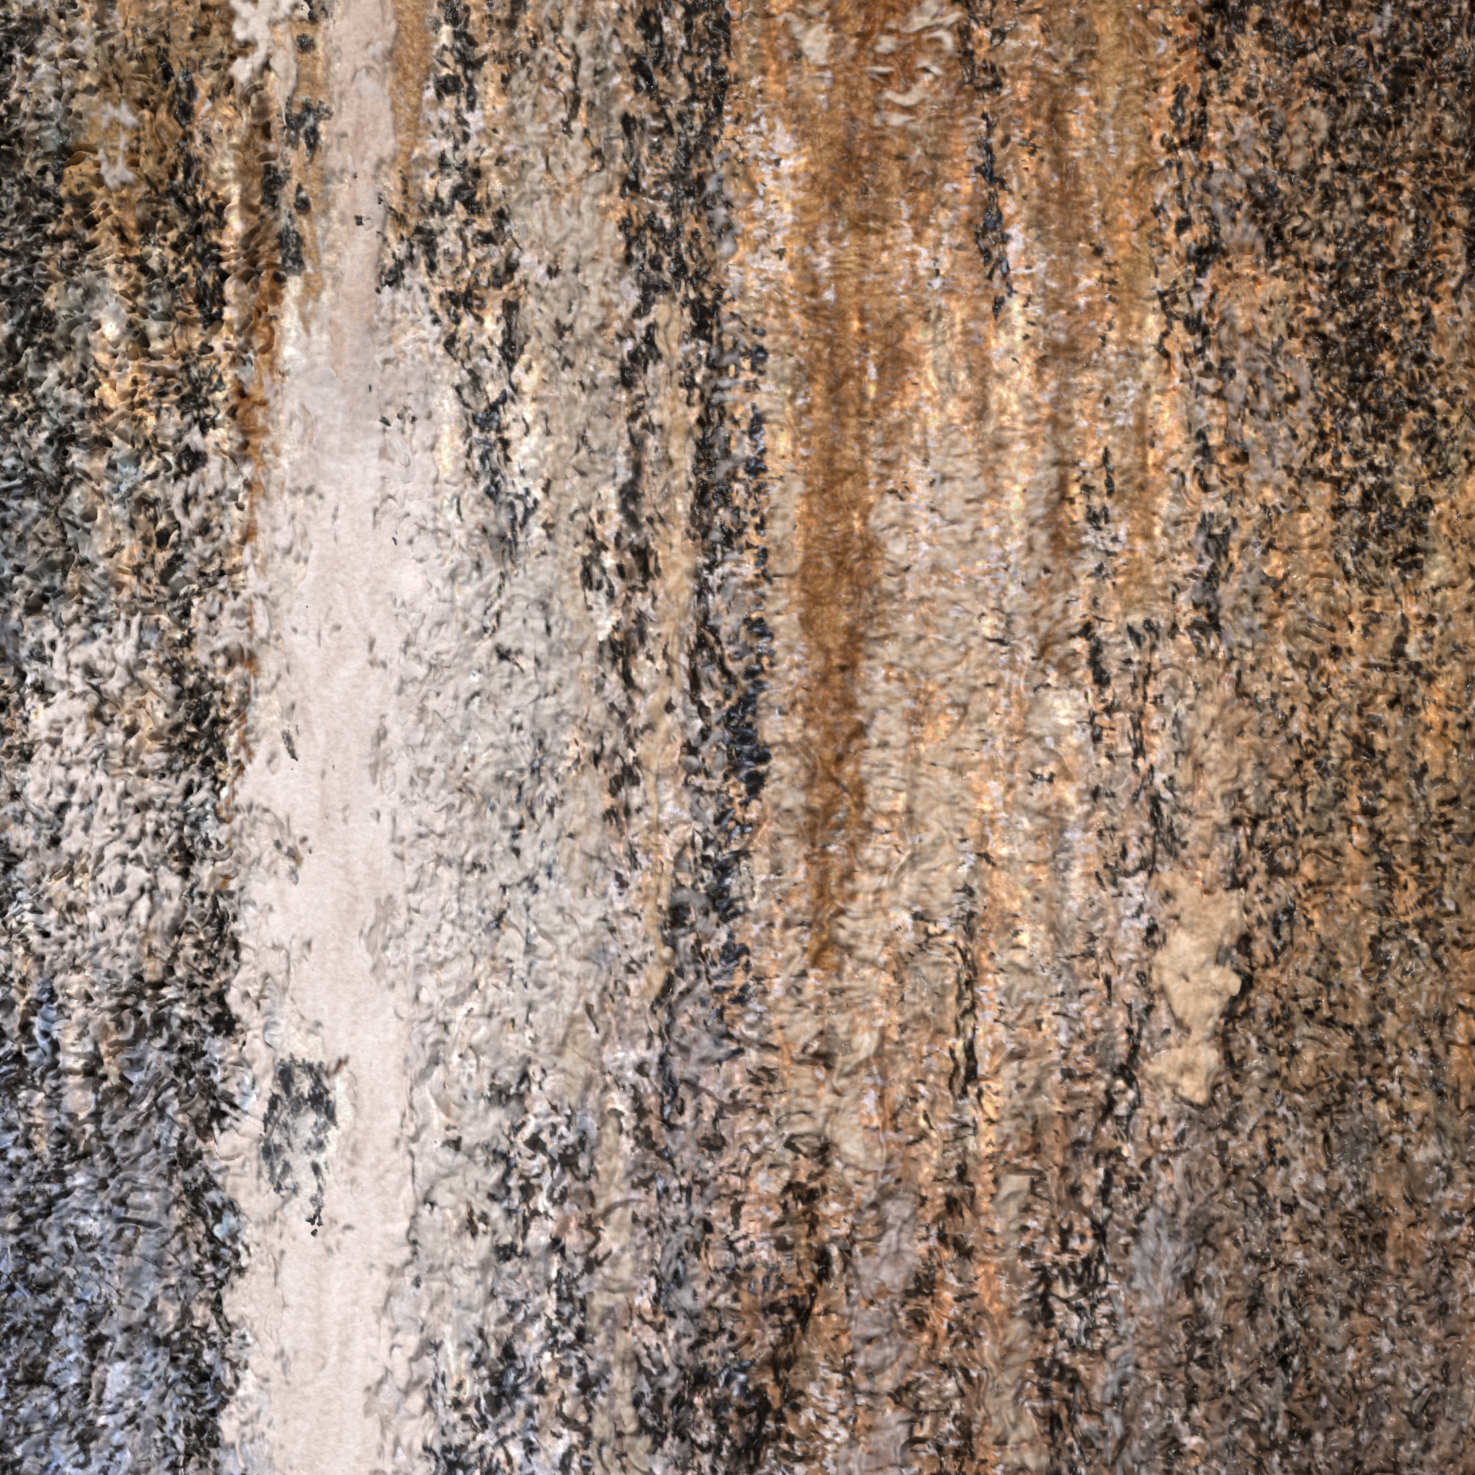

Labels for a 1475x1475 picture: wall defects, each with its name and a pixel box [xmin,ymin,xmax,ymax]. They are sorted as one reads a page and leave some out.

corrosion [61,0,259,211]
corrosion [219,593,265,889]
corrosion [230,0,329,573]
leakage [0,0,987,1475]
corrosion [786,0,933,973]
leakage [869,0,1014,320]
leakage [987,390,1189,1475]
leakage [1167,0,1475,1475]